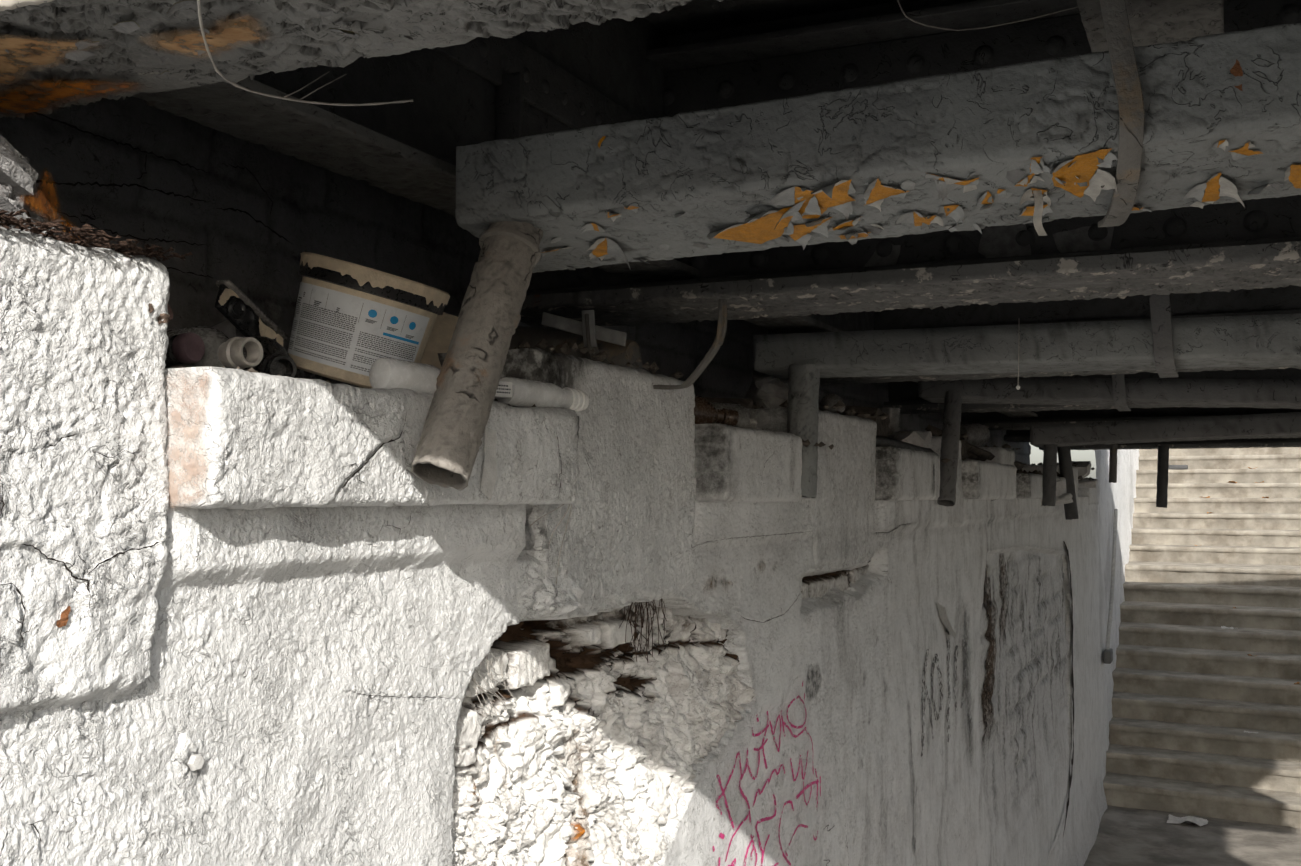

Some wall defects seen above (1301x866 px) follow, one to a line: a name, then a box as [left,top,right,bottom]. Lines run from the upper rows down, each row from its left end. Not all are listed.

rust [0,37,133,116]
rust [154,18,262,56]
rust [21,172,81,243]
peeling [692,148,1117,267]
peeling [1182,165,1301,209]
crack [40,434,141,471]
crack [338,412,407,493]
crack [0,583,34,651]
crack [0,480,162,613]
spalling [801,560,870,600]
crack [1063,541,1074,836]
spalling [452,602,757,866]